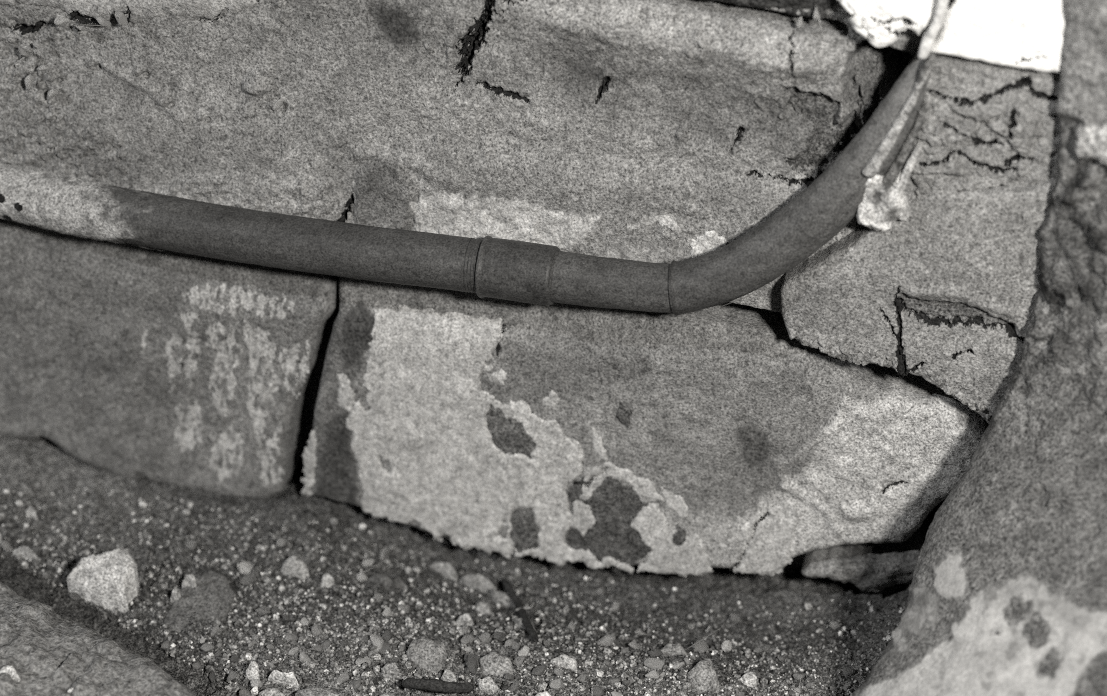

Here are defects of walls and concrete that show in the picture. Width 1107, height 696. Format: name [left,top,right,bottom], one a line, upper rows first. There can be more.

crack [455,0,532,103]
crack [920,56,1058,191]
crack [880,287,1025,377]
flaking render [301,427,318,496]
flaking render [337,304,713,577]
flaking render [733,499,804,576]